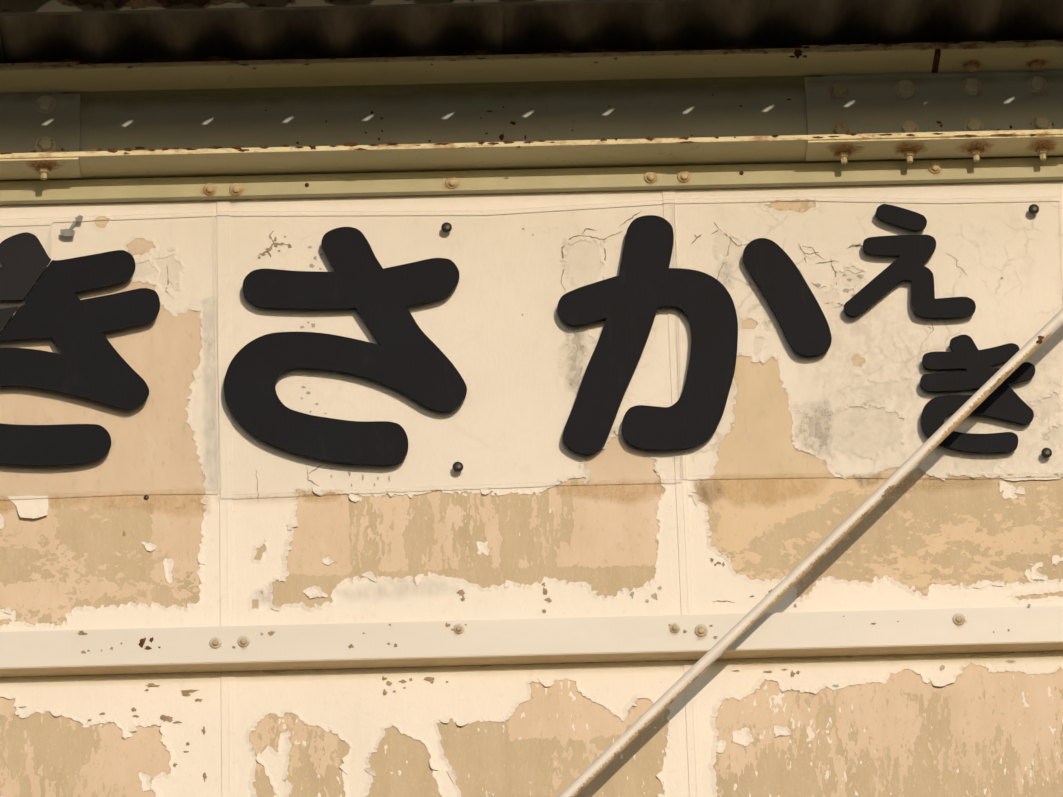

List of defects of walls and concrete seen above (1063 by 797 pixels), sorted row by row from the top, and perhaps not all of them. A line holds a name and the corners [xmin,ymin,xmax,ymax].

corrosion [58,0,244,9]
corrosion [814,133,865,155]
corrosion [897,121,1055,153]
peeling [559,234,609,288]
peeling [712,227,747,269]
peeling [557,324,599,392]
peeling [0,234,211,630]
peeling [686,305,1063,607]
peeling [247,427,671,613]
peeling [0,691,190,797]
peeling [245,675,675,797]
peeling [708,657,1063,797]